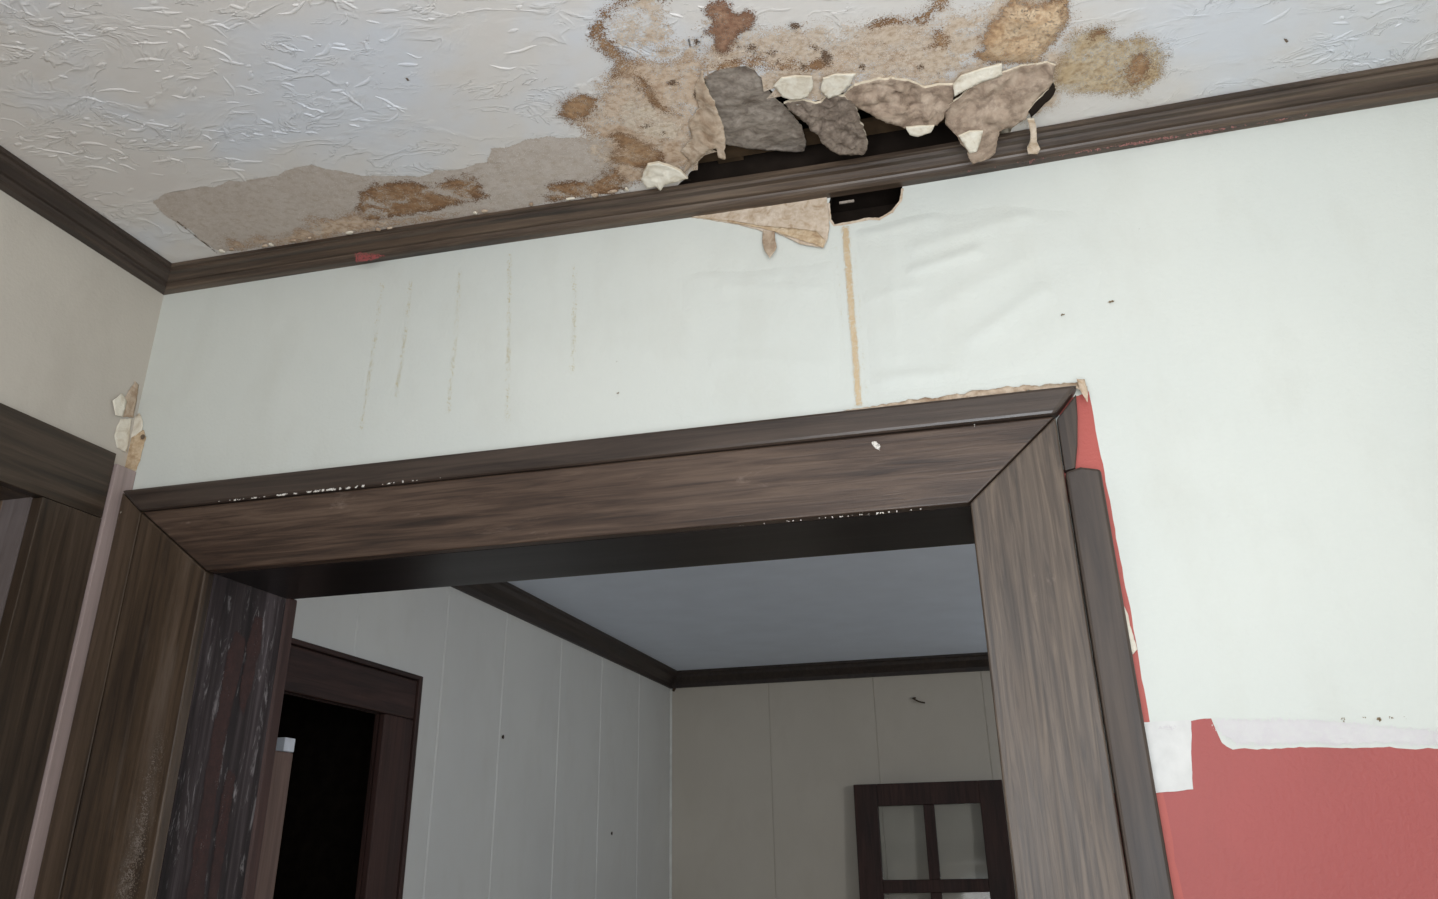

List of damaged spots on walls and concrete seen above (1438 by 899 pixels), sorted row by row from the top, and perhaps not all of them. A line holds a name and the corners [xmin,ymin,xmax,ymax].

flaking render [641,61,1056,191]
spalling [827,187,904,226]
peeling [112,381,146,471]